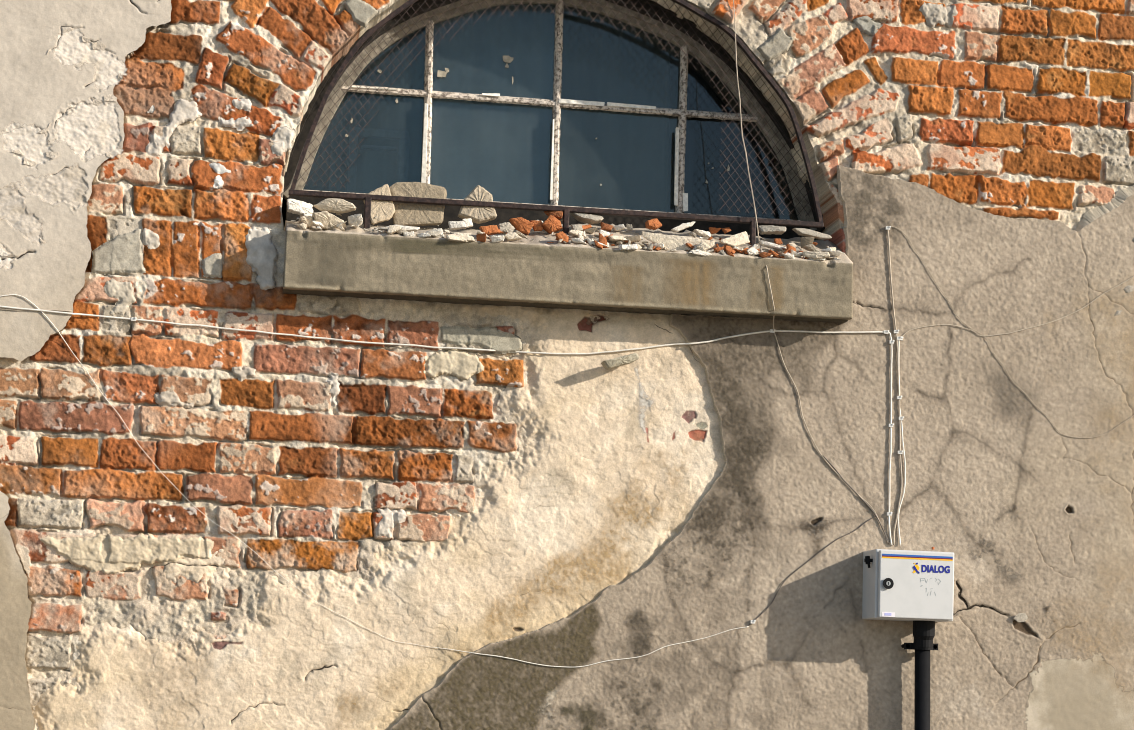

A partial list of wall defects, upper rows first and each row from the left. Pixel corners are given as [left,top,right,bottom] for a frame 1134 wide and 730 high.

spalling [838,0,1134,230]
spalling [814,188,846,253]
spalling [0,0,725,730]
damp [674,315,843,586]
damp [393,605,661,730]
crack [953,581,1078,689]
spalling [1022,652,1134,730]